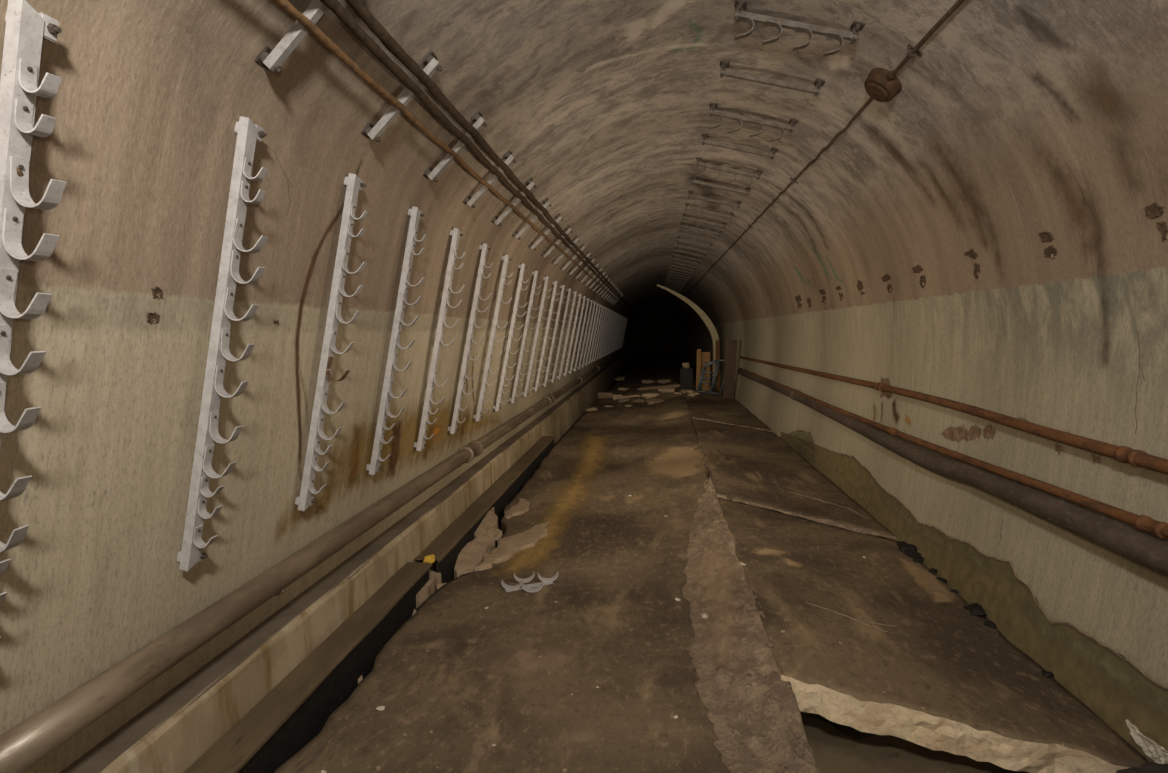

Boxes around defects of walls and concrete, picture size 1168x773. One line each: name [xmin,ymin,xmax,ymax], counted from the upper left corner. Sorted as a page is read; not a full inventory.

spalling [941,424,995,442]
flaking render [780,430,1168,773]